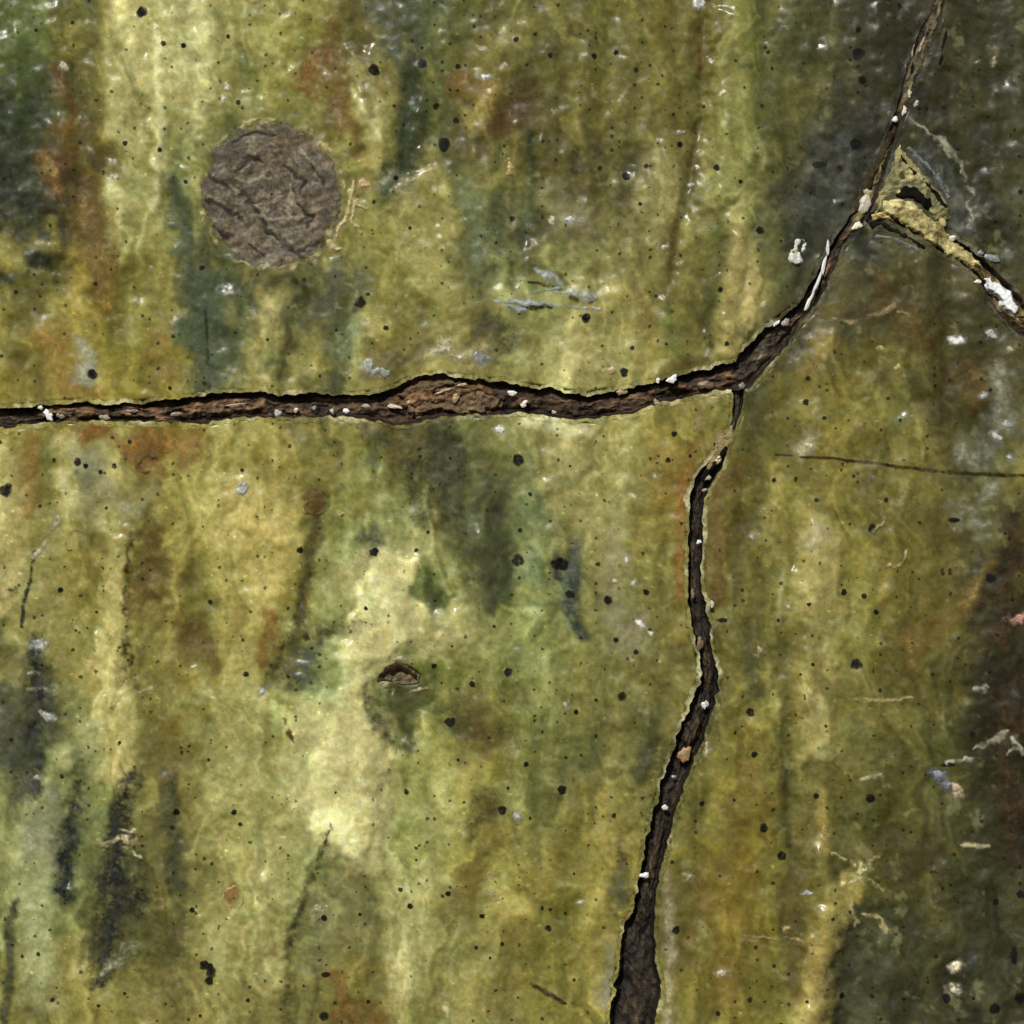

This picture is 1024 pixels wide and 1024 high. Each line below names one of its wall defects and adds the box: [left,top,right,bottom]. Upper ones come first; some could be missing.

crack [0,0,1024,469]
crack [775,454,1024,477]
crack [8,551,36,628]
crack [606,221,867,1024]
hole [377,656,428,696]
water stain [90,772,147,990]
crack [287,887,305,987]